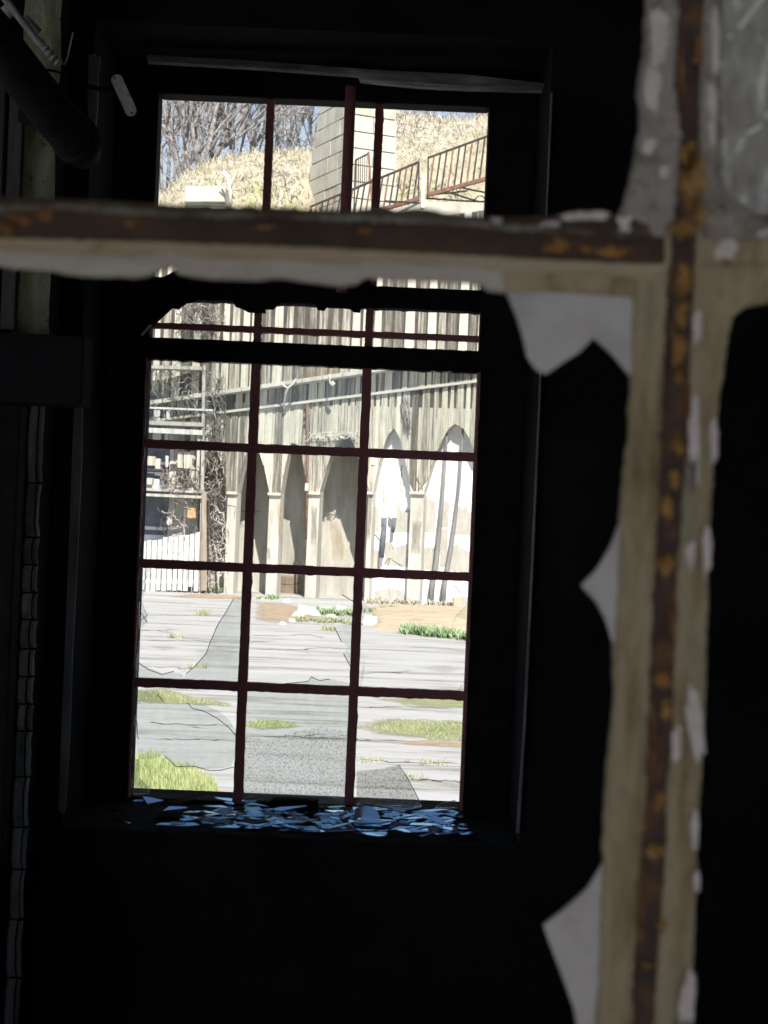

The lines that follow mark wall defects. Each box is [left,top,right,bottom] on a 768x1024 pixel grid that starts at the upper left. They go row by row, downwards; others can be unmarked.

peeling [644,6,671,114]
peeling [707,1,720,150]
peeling [640,138,657,156]
rust [543,237,633,258]
peeling [714,238,740,261]
rust [669,262,693,458]
rust [659,470,681,518]
rust [655,552,678,650]
crack [134,598,235,771]
crack [260,627,402,684]
crack [264,734,461,807]